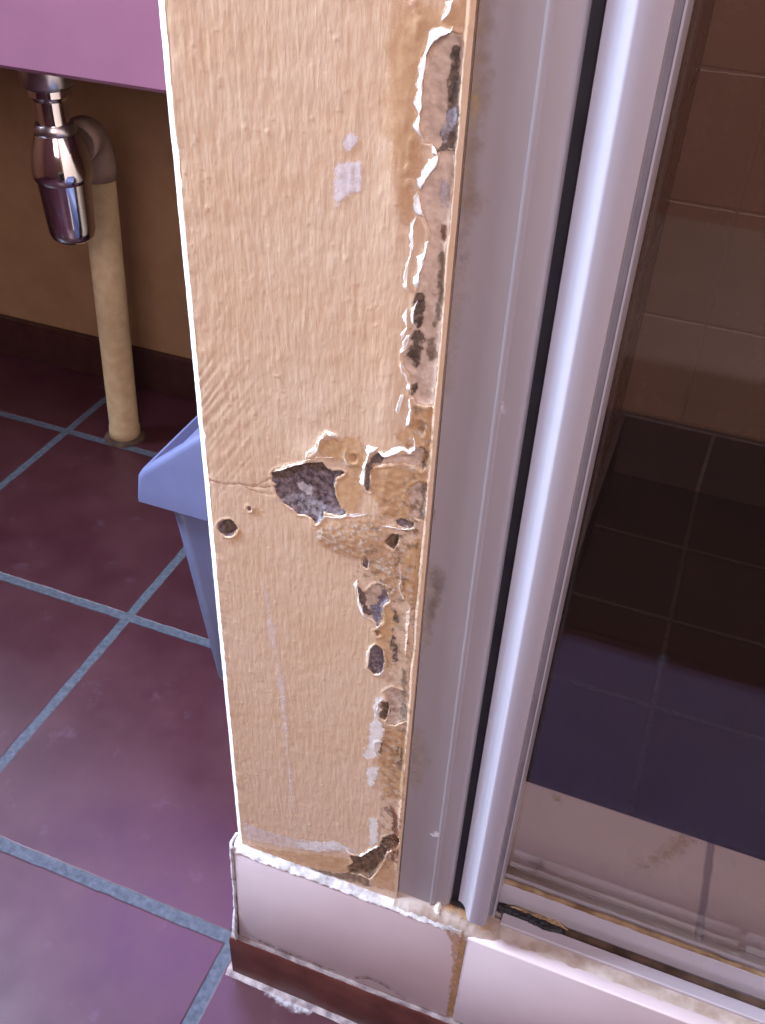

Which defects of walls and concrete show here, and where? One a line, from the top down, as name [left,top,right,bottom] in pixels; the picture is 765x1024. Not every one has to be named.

peeling [272,0,464,549]
flaking render [218,519,238,536]
flaking render [354,564,410,676]
peeling [363,670,407,787]
flaking render [346,835,400,878]